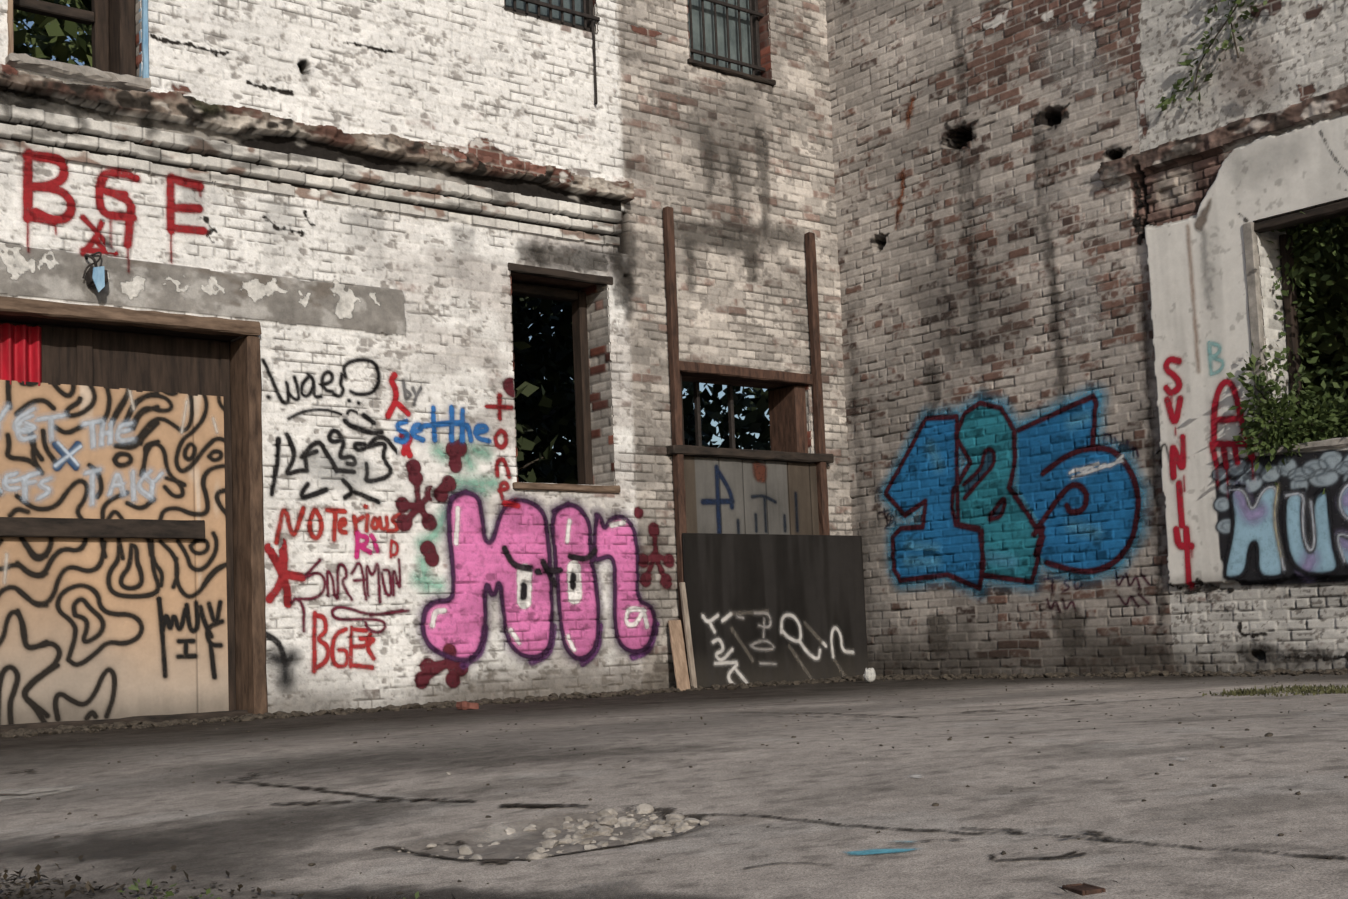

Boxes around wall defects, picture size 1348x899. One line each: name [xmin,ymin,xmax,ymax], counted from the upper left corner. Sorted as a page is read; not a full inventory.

flaking render [971,8,1014,30]
flaking render [172,84,191,94]
flaking render [1029,0,1148,160]
hole [941,119,979,152]
leakage [674,129,799,290]
peeling [1195,200,1211,231]
peeling [0,242,59,280]
peeling [108,273,146,300]
peeling [163,275,225,296]
peeling [241,278,311,307]
peeling [331,279,380,319]
leakage [924,365,940,406]